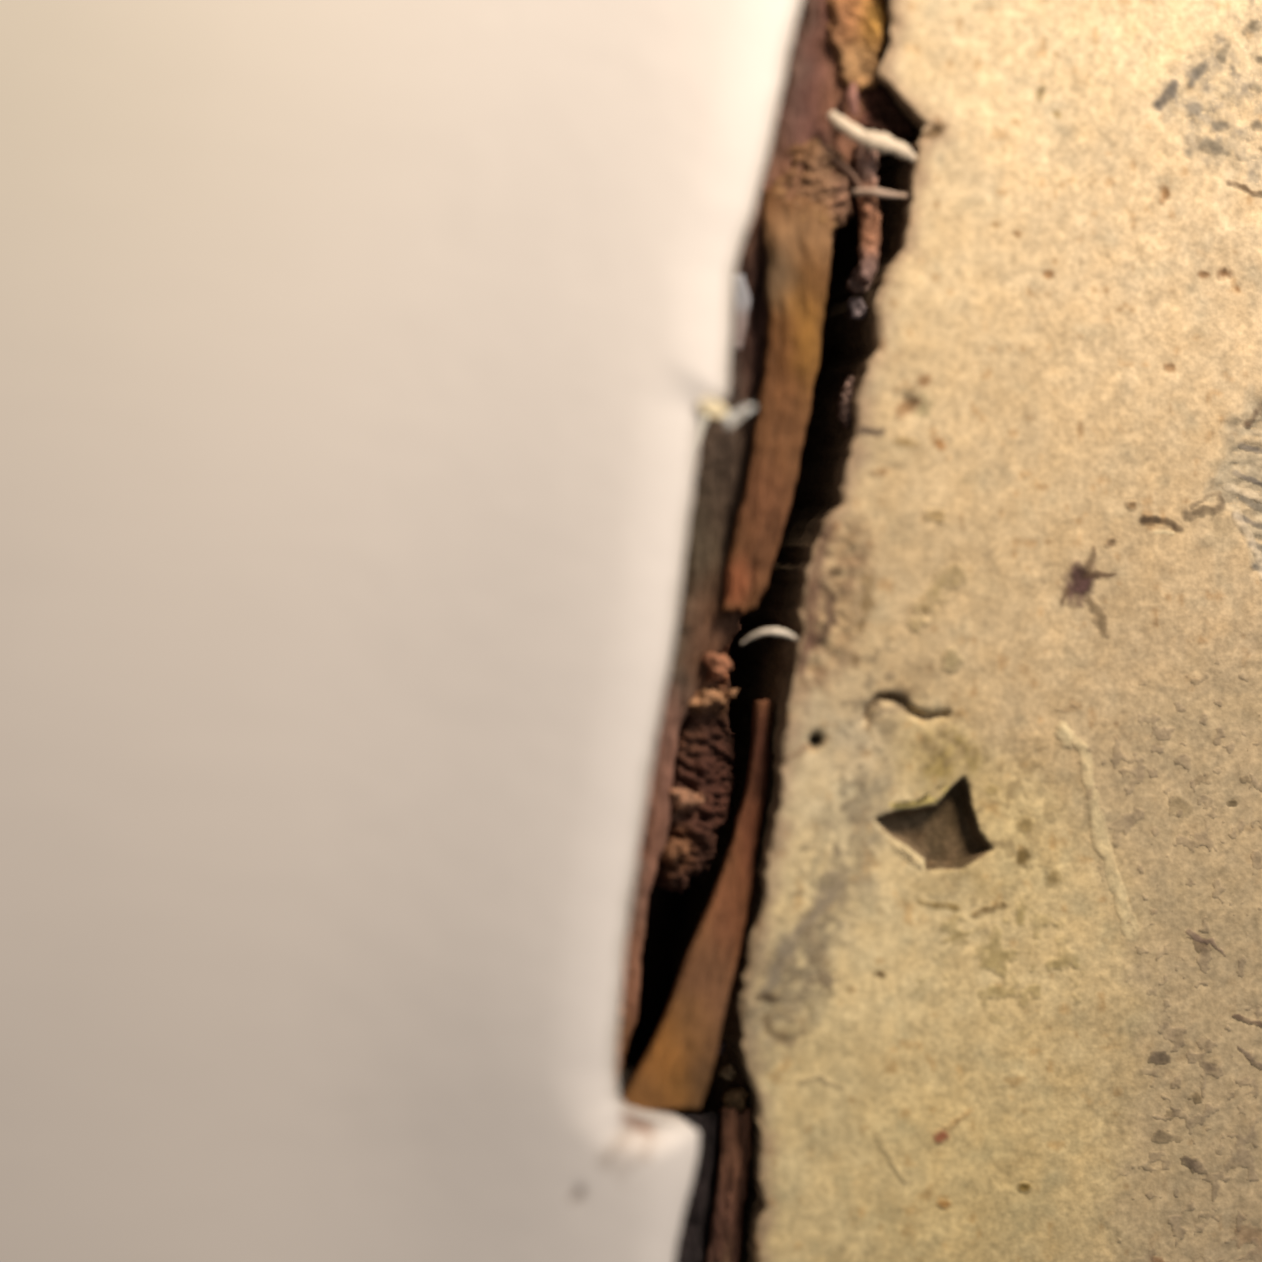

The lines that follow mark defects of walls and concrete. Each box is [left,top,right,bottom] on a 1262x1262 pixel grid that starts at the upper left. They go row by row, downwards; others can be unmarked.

peeling [700,399,756,430]
spalling [857,373,949,453]
spalling [791,508,882,708]
crack [862,649,950,741]
spalling [751,938,846,1050]
spalling [871,968,887,980]
peeling [874,618,1262,1262]
crack [796,1073,847,1091]
crack [872,1129,910,1185]